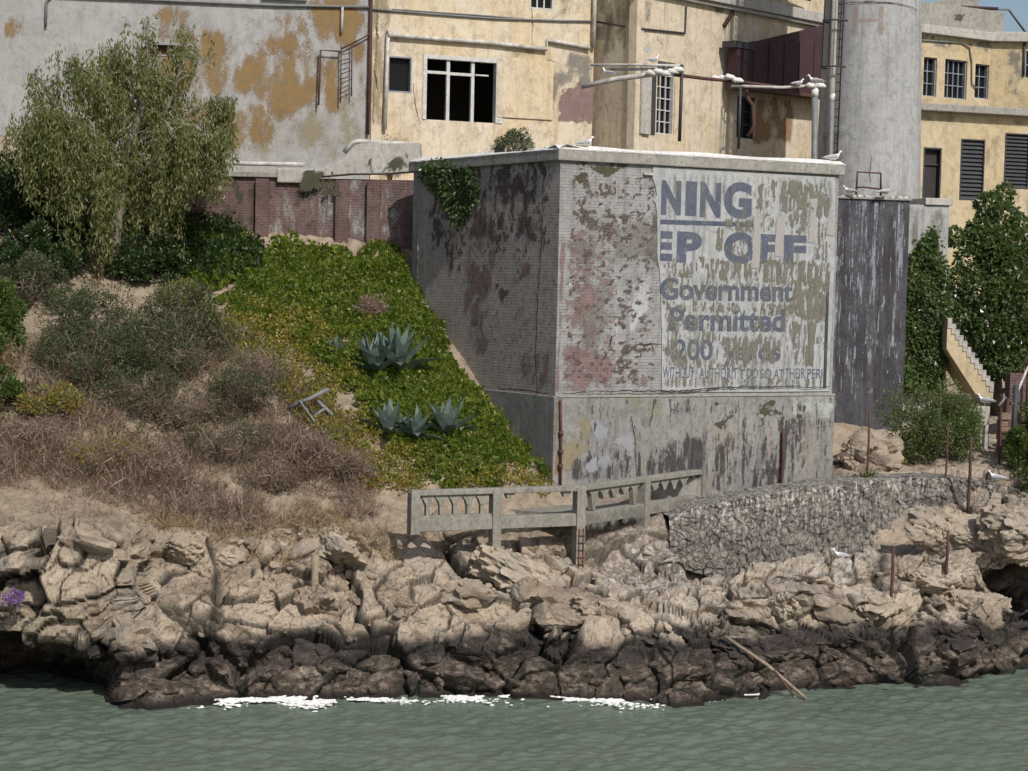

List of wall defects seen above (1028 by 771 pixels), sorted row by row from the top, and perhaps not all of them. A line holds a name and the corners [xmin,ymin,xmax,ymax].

flaking render [553,53,595,125]
flaking render [429,147,831,392]
water stain [562,83,930,490]